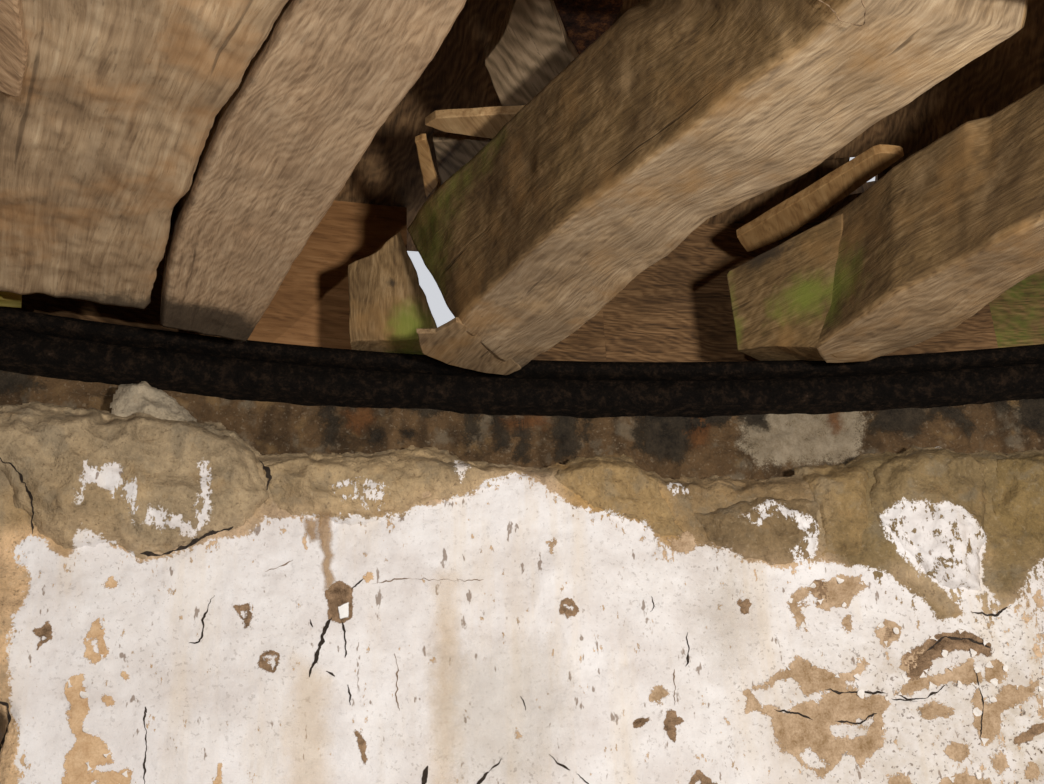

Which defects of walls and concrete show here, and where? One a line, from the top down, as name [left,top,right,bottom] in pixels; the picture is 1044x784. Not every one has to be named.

water stain [492,415,531,464]
water stain [632,416,726,465]
water stain [737,411,867,467]
water stain [994,399,1044,435]
crack [351,578,484,590]
peeling [737,599,752,615]
peeling [787,574,869,633]
peeling [33,621,53,650]
peeling [61,618,133,784]
crack [309,618,352,705]
crack [393,656,401,710]
peeling [737,619,1044,784]